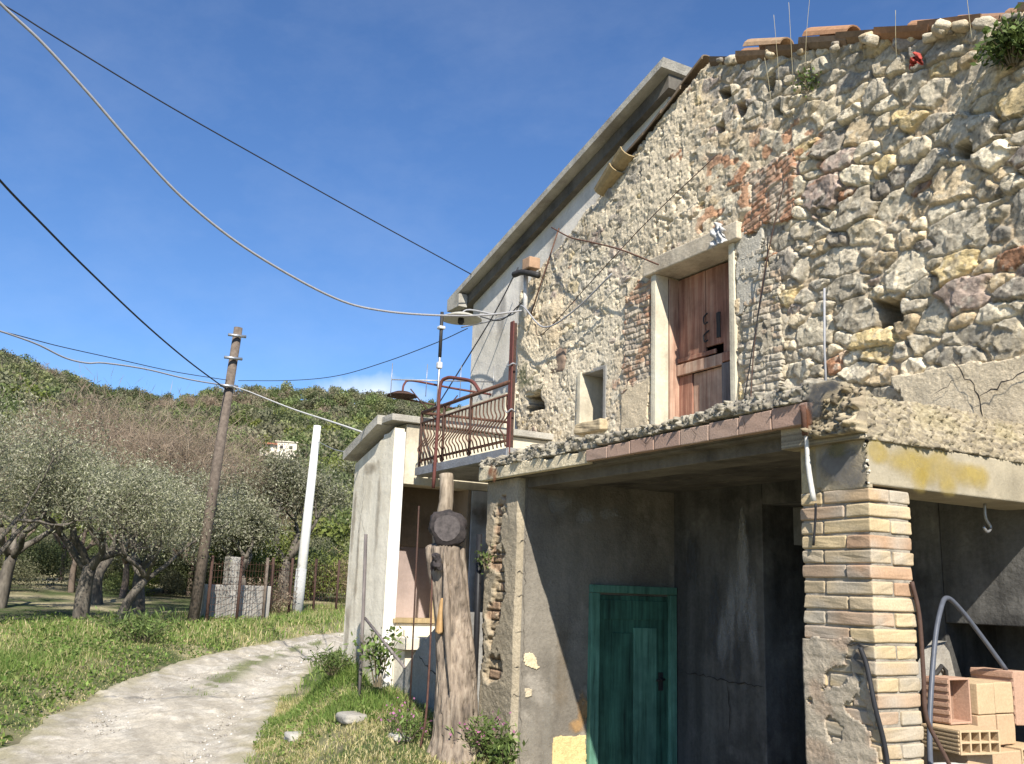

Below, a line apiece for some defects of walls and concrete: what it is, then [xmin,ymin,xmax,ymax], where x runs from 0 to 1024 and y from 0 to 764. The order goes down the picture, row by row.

crack [931,360,1024,416]
spalling [478,478,540,764]
spalling [802,636,880,764]